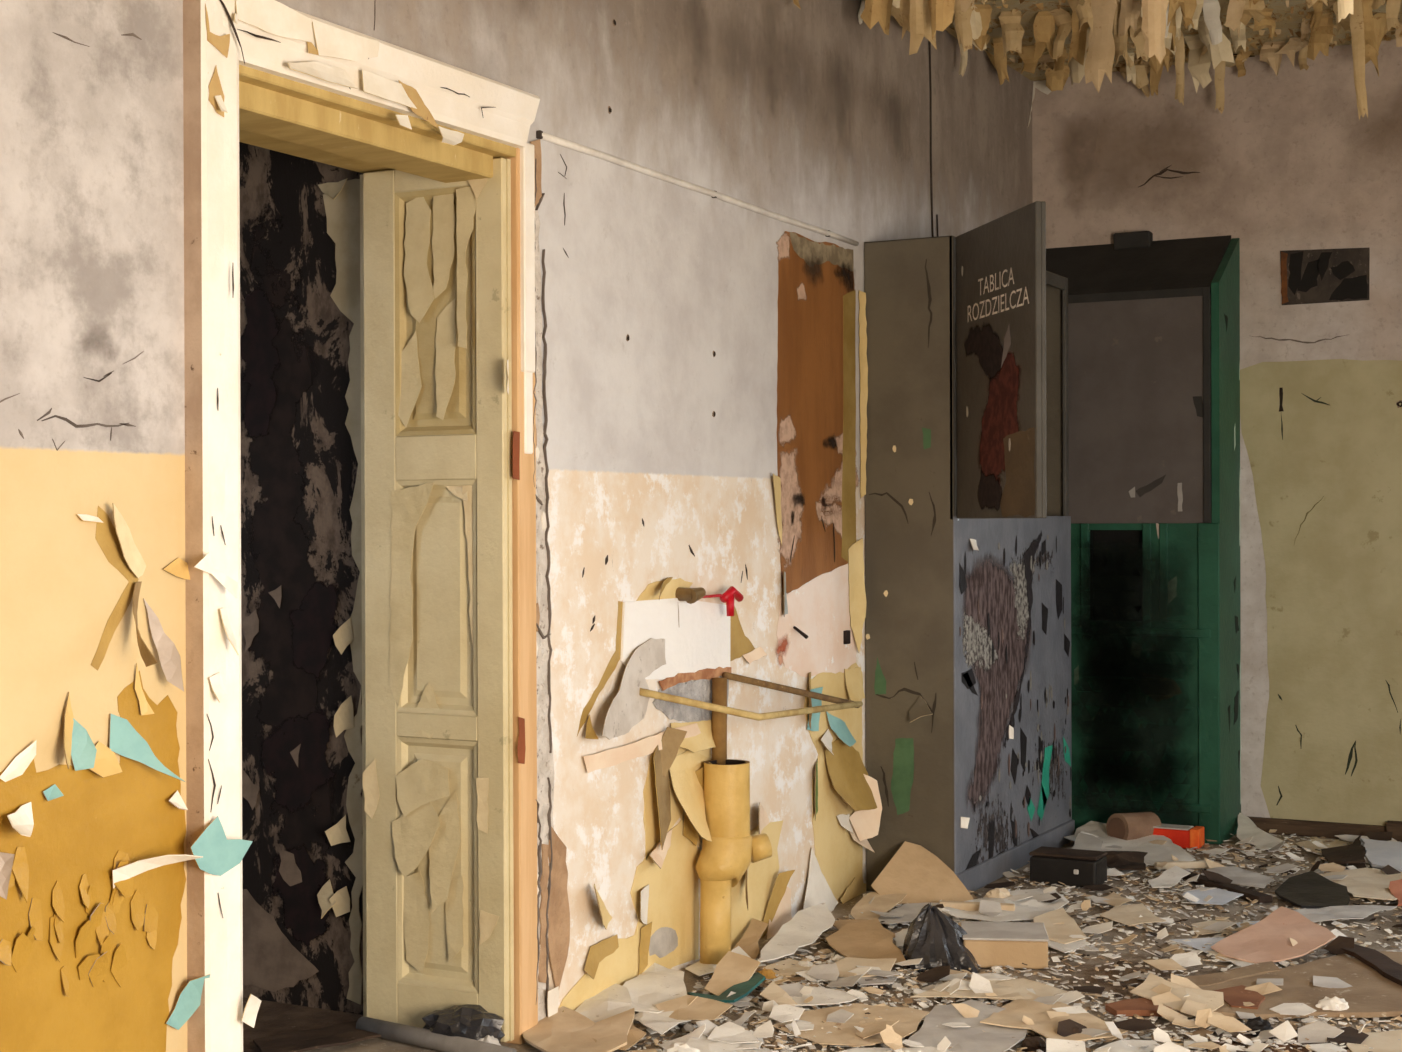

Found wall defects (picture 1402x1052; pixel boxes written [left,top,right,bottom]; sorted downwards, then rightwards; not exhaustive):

peeling [205,0,464,146]
peeling [858,0,1402,126]
crack [0,393,136,451]
crack [83,351,144,382]
flaking render [530,139,882,1021]
peeling [0,503,253,1052]
peeling [241,994,261,1028]